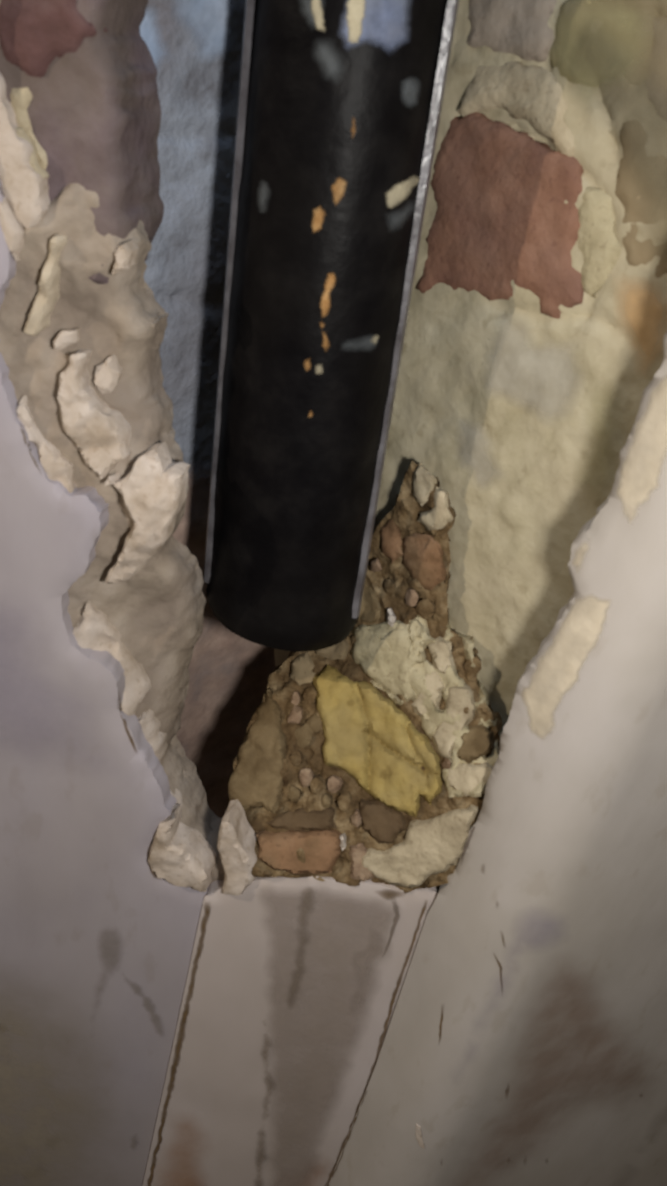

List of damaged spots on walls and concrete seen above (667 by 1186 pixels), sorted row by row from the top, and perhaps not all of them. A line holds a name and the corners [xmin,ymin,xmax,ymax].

flaking render [0,73,257,896]
peeling [618,378,667,520]
peeling [523,597,609,737]
damp [258,891,389,1186]